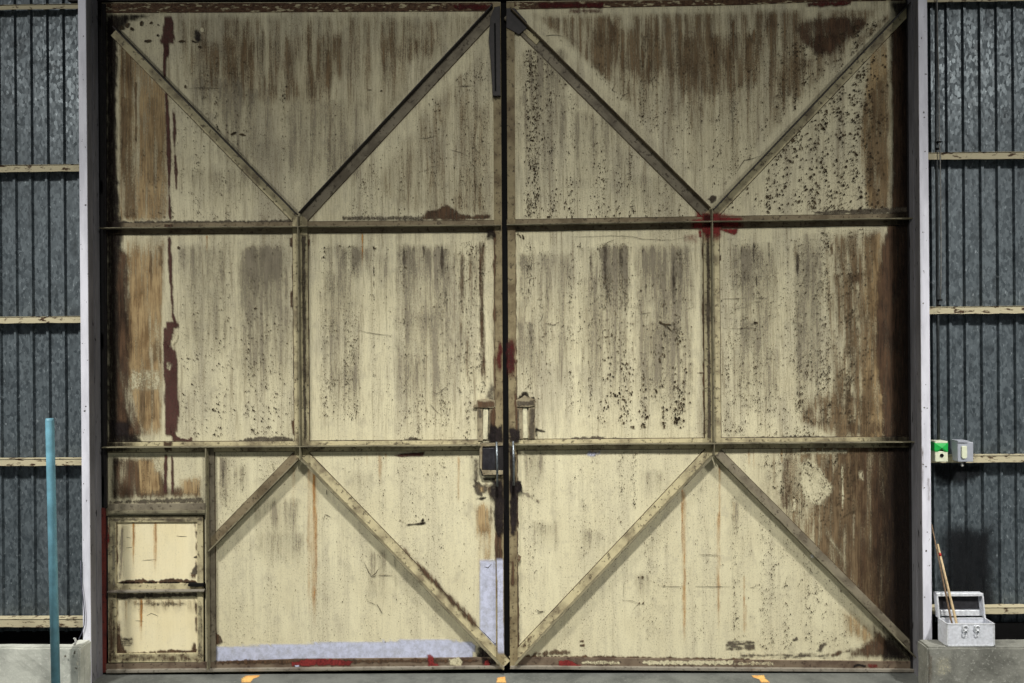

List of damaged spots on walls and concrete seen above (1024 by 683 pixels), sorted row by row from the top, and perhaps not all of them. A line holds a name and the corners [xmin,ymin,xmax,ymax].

rust [106,15,216,504]
water stain [328,246,368,291]
rust [343,134,496,426]
water stain [384,246,463,397]
water stain [518,254,563,357]
water stain [588,245,692,400]
rust [543,2,923,661]